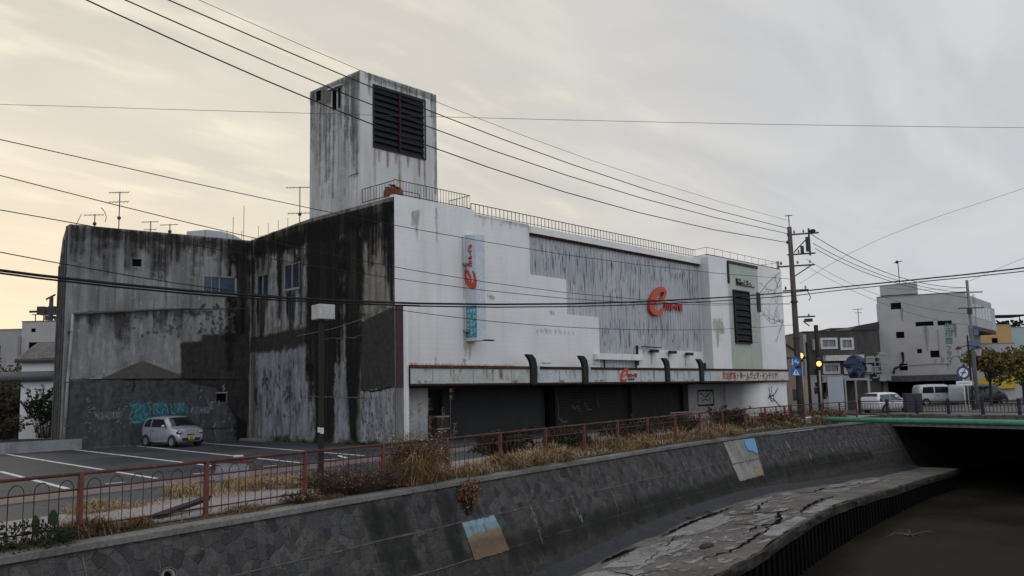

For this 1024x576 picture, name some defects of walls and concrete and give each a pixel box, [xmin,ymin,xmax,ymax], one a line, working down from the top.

damp [311,71,432,165]
damp [64,200,395,448]
peeling [256,347,315,439]
peeling [334,361,395,443]
crack [600,480,879,576]